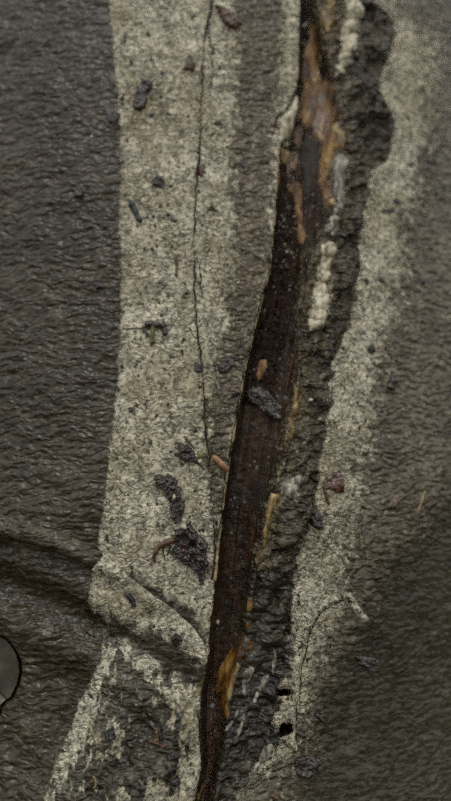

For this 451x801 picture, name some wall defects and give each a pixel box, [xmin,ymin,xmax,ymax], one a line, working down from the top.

corrosion [278,0,346,244]
peeling [335,0,364,75]
peeling [308,154,349,331]
crack [192,0,353,801]
peeling [281,475,309,503]
corrosion [215,622,253,719]